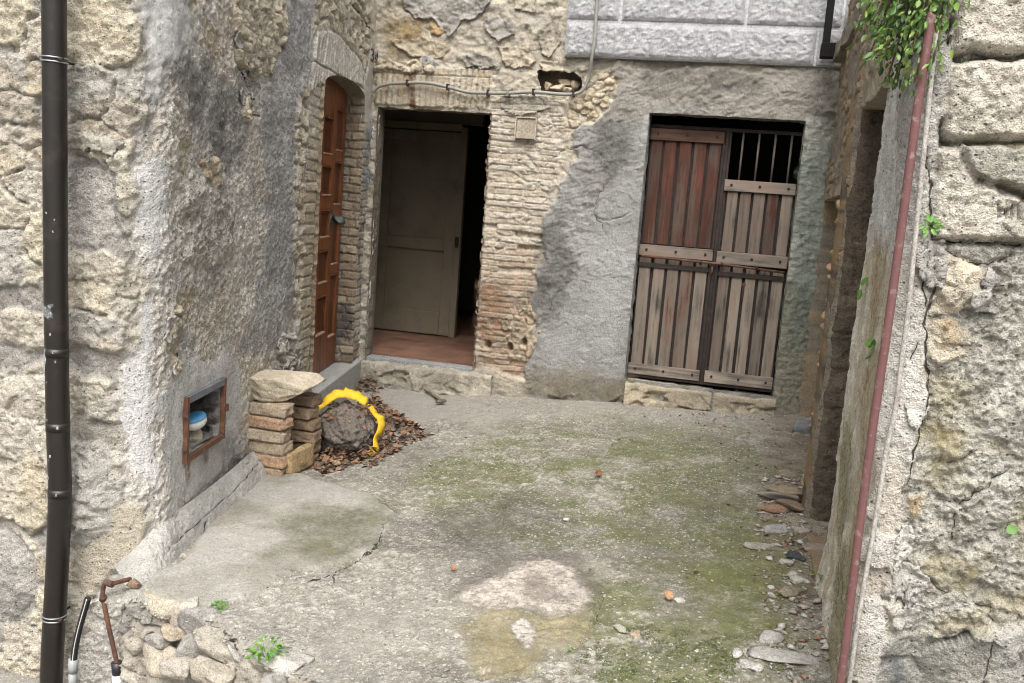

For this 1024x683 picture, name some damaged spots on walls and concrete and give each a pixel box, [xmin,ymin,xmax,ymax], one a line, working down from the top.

flaking render [373,0,616,119]
flaking render [501,298,541,364]
crack [907,281,976,484]
crack [307,524,384,584]